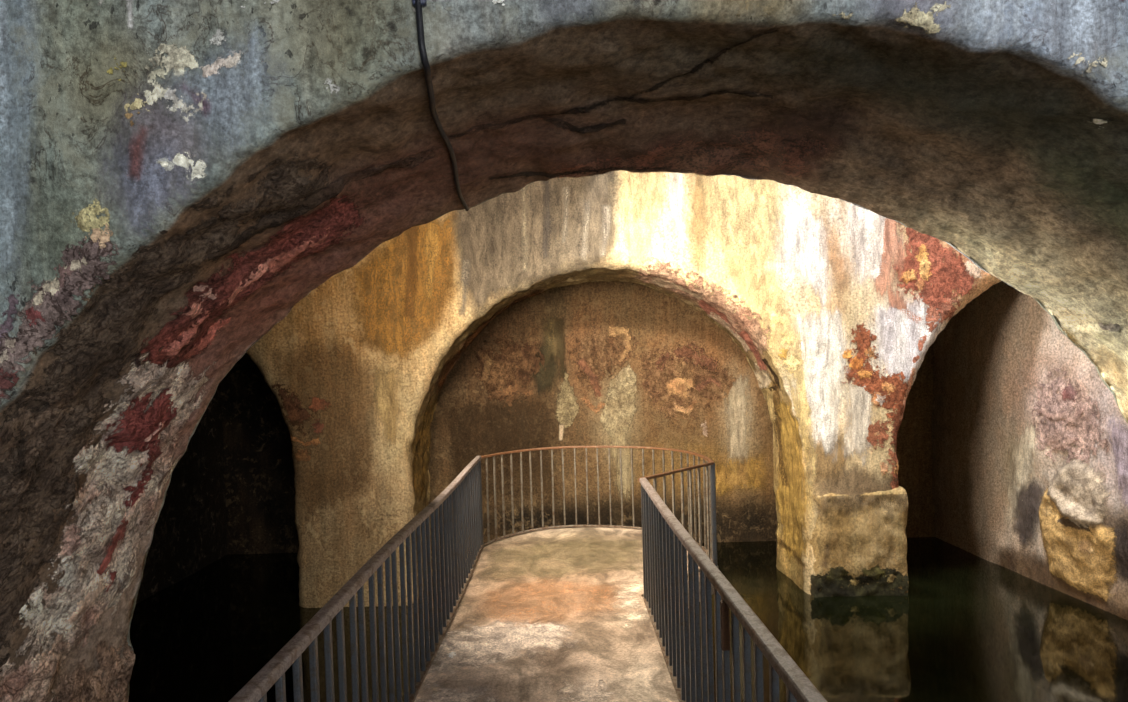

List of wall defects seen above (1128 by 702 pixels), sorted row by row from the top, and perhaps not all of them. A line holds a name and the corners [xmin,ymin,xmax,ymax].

peeling [124,29,243,126]
crack [449,30,778,139]
crack [489,167,671,179]
peeling [0,149,436,702]